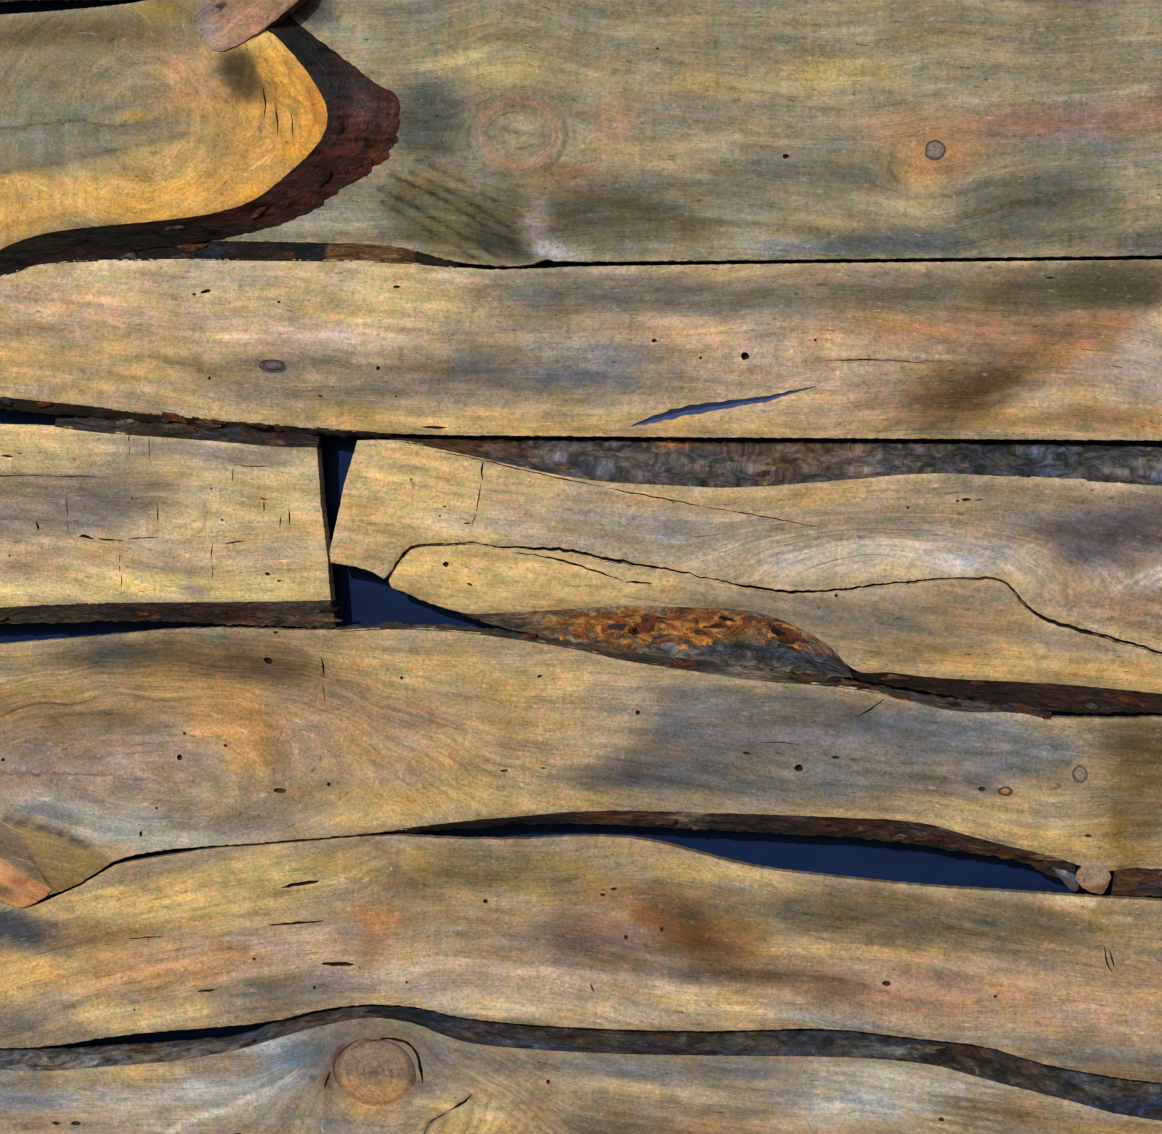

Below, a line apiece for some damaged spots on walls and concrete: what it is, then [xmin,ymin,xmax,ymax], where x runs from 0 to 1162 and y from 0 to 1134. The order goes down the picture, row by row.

crack [827,357,926,365]
crack [631,386,816,427]
crack [388,426,1162,655]